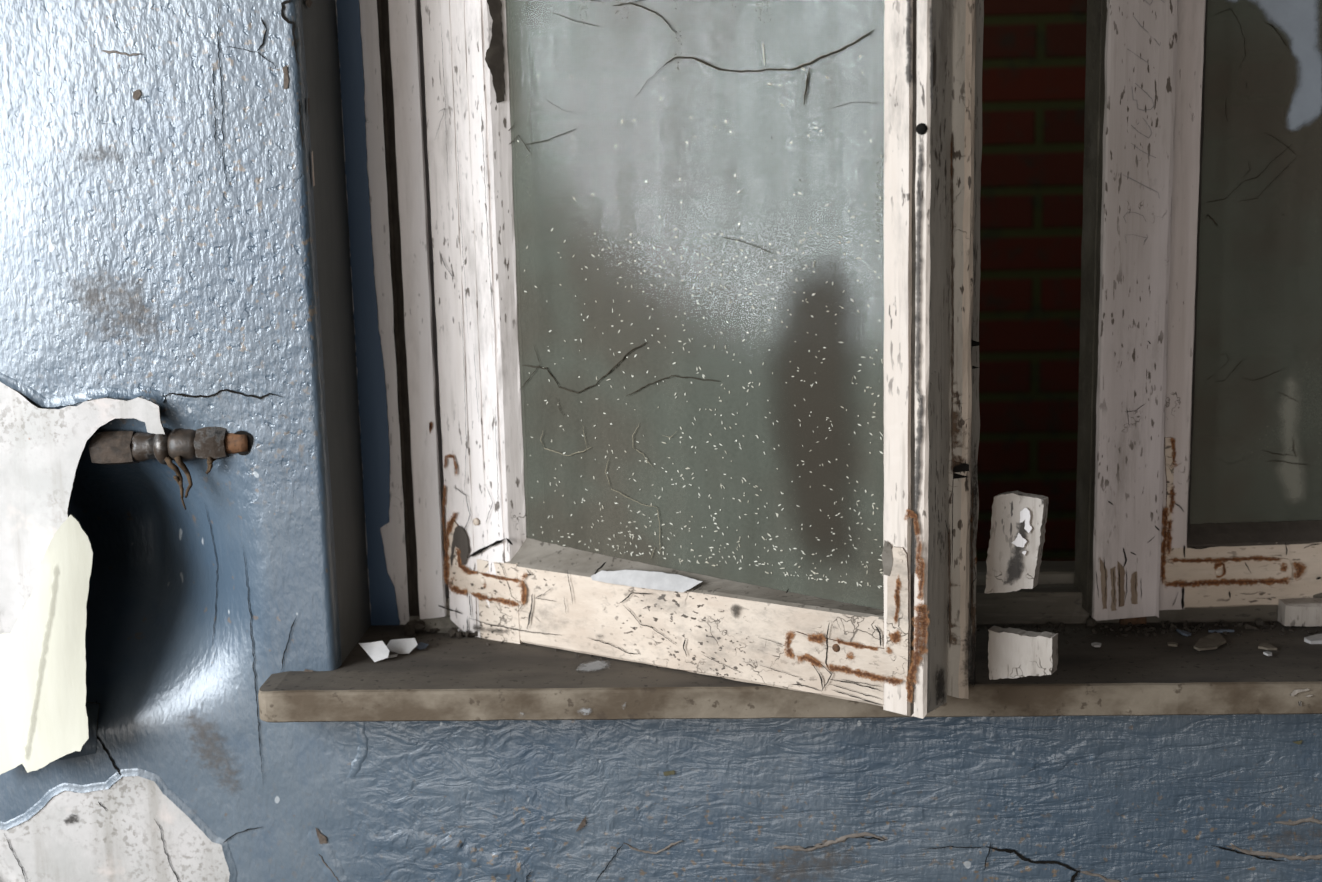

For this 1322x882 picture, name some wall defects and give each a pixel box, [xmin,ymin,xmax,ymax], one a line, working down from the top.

crack [164,389,281,400]
peeling [0,373,166,775]
peeling [0,768,238,882]
crack [922,844,1120,882]